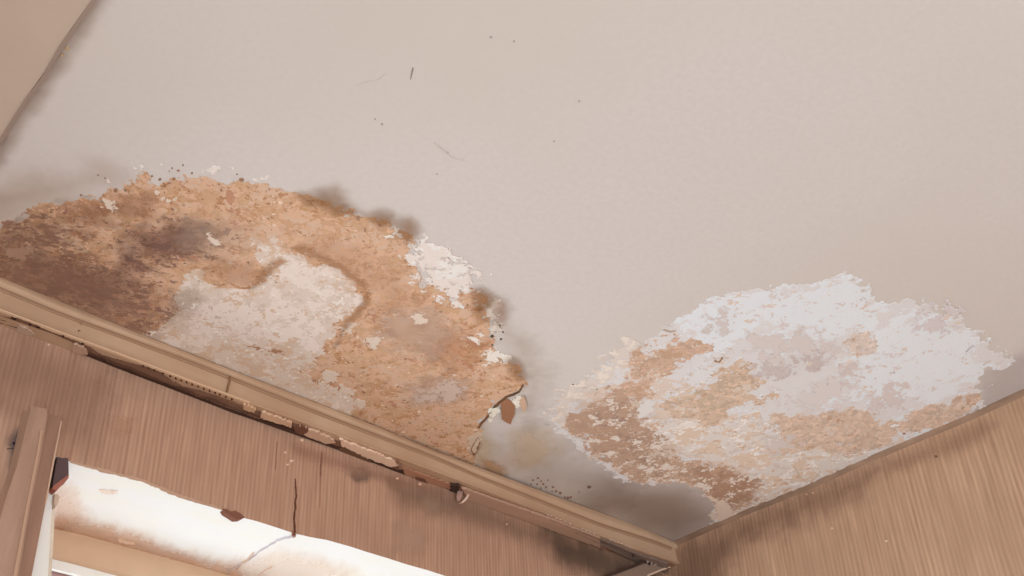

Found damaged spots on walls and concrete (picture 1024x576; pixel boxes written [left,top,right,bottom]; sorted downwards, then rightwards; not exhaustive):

crack [84,354,341,576]
flaking render [0,162,528,468]
crack [368,459,413,478]
flaking render [542,271,1016,525]